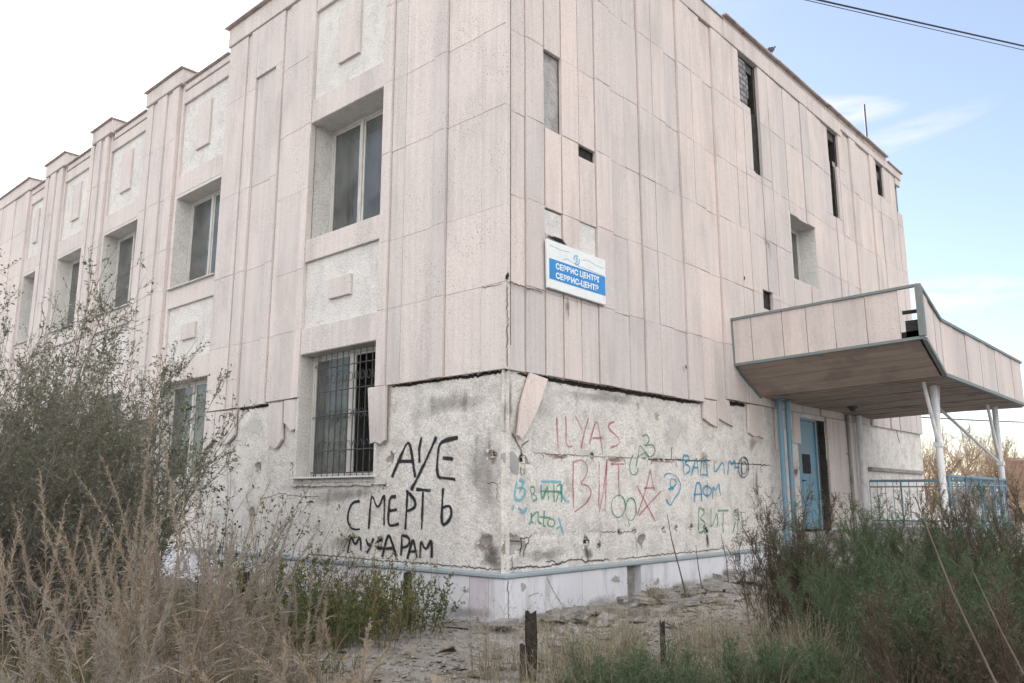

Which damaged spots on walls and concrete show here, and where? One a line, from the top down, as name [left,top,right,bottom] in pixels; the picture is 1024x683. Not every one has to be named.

peeling [545,210,561,238]
crack [482,281,544,366]
crack [488,433,770,500]
spalling [477,530,526,555]